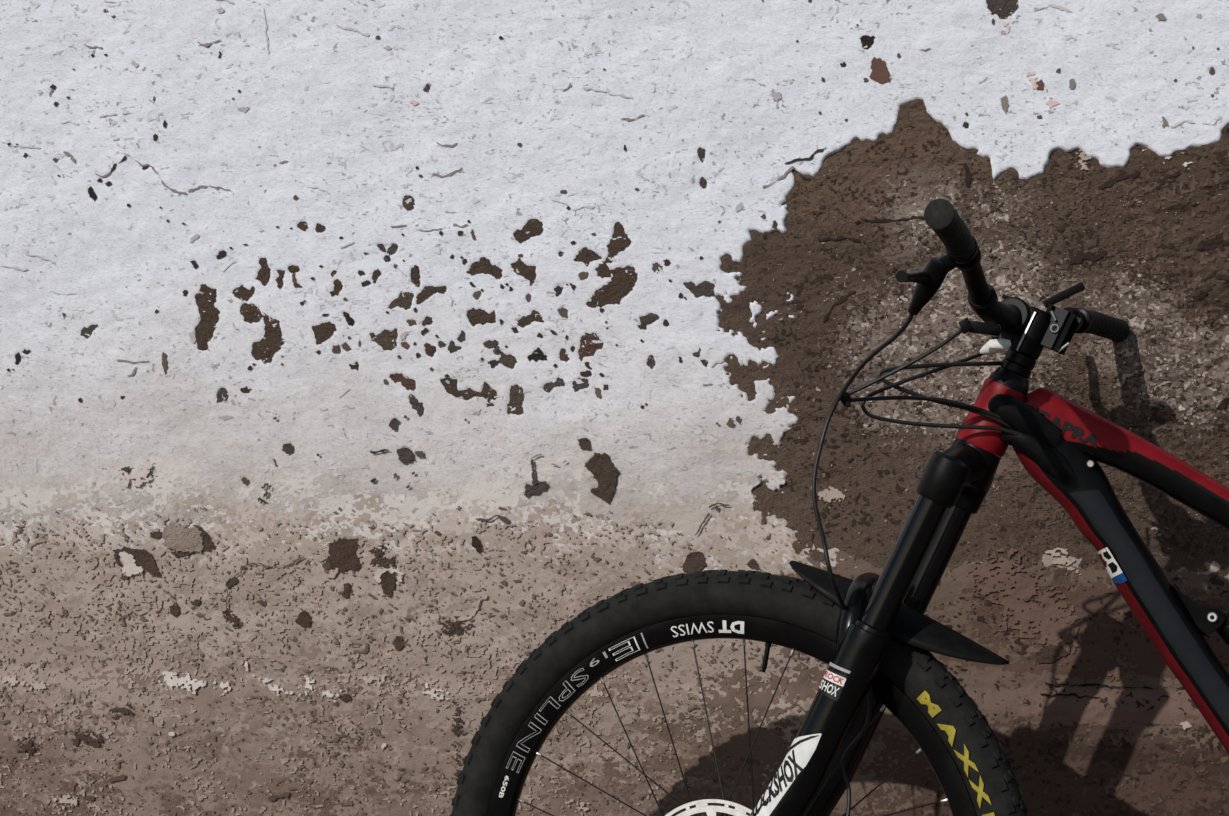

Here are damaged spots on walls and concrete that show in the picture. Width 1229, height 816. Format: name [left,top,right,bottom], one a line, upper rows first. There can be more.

spalling [986,0,1018,24]
spalling [652,259,716,299]
spalling [183,284,220,350]
spalling [232,219,637,430]
spalling [638,313,669,342]
spalling [216,386,251,403]
spalling [393,448,424,490]
spalling [578,438,619,503]
spalling [113,531,162,580]
spalling [322,537,361,598]
spalling [373,567,404,597]
peeling [967,547,1085,654]